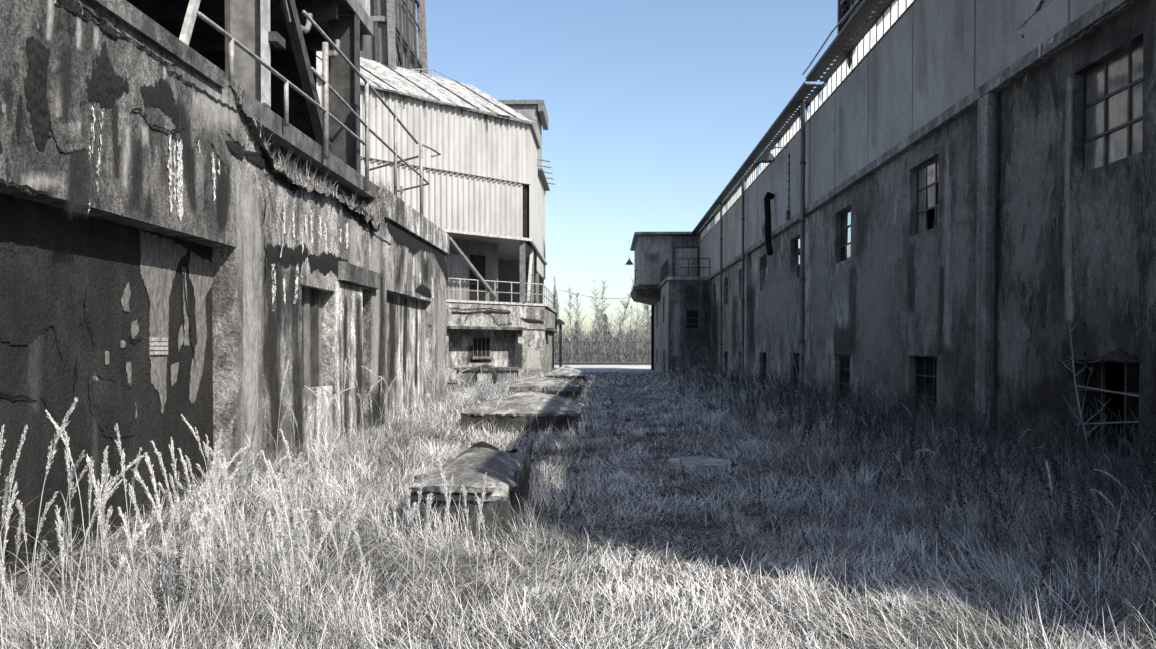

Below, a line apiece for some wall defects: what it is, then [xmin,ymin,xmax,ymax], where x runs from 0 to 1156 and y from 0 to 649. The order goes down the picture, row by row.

damp [56,17,98,118]
damp [23,104,152,216]
flaking render [93,229,213,413]
spalling [264,241,348,277]
damp [167,84,445,480]
damp [458,341,480,363]
damp [833,144,975,394]
damp [996,71,1156,423]